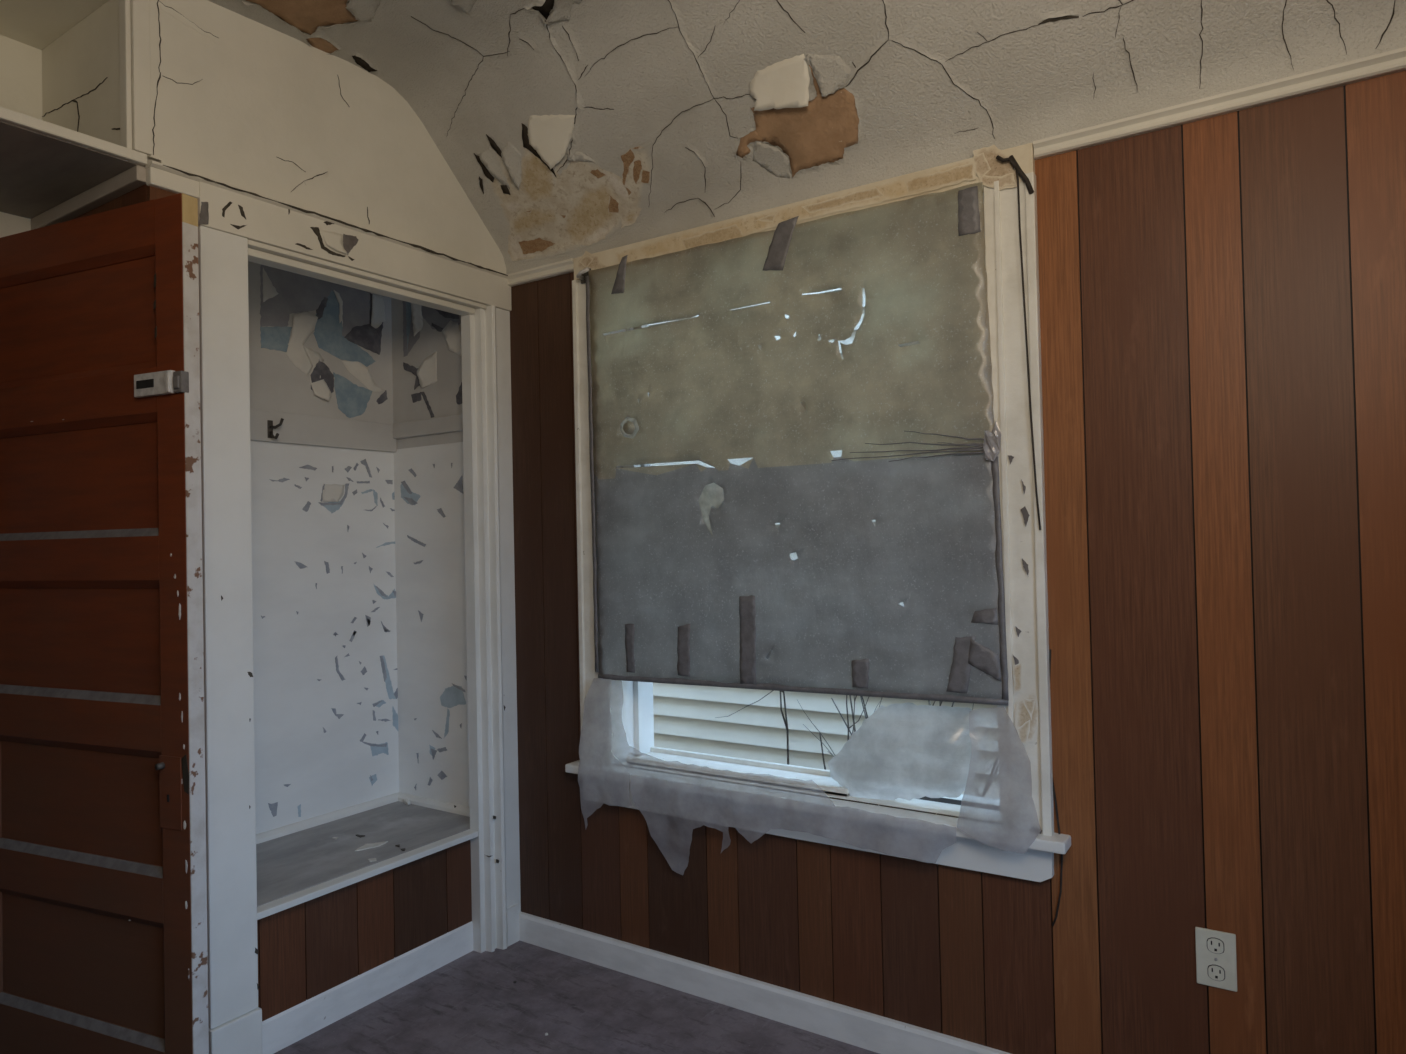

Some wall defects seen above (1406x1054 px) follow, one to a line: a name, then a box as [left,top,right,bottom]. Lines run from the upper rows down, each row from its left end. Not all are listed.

crack [42,77,108,132]
crack [112,0,508,276]
peeling [241,0,382,75]
crack [411,0,750,221]
peeling [731,54,866,180]
crack [845,0,1138,139]
crack [1199,0,1211,89]
crack [1272,0,1402,72]
peeling [296,221,358,261]
peeling [260,265,388,418]
peeling [402,301,462,418]
peeling [270,459,426,756]